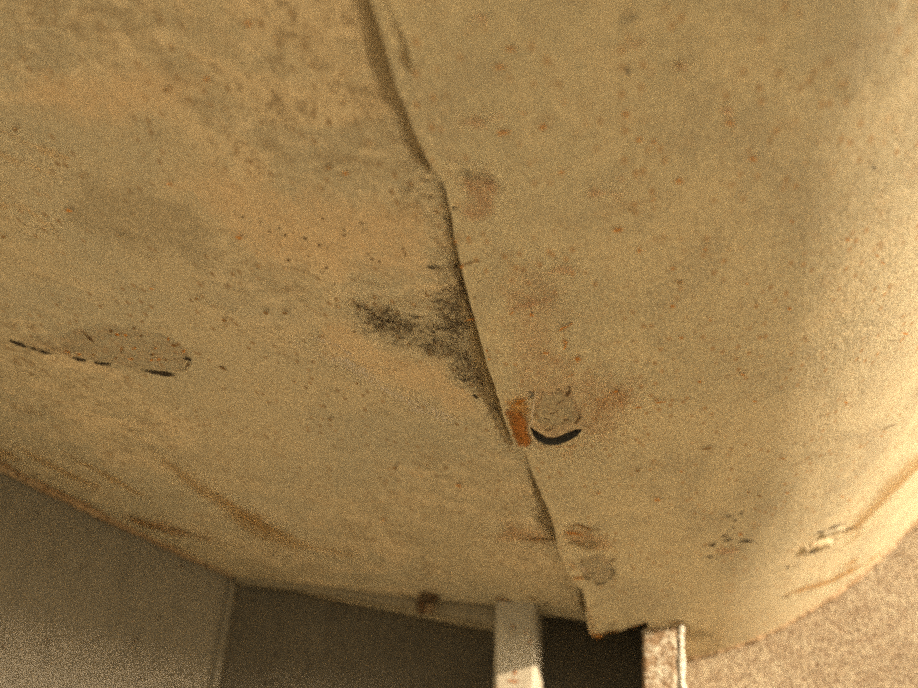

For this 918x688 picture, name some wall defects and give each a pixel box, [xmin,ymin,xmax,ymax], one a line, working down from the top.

water stain [1,45,225,140]
water stain [38,142,498,424]
peeling [9,324,191,377]
rust [506,400,530,447]
peeling [529,386,581,446]
peeling [579,554,616,585]